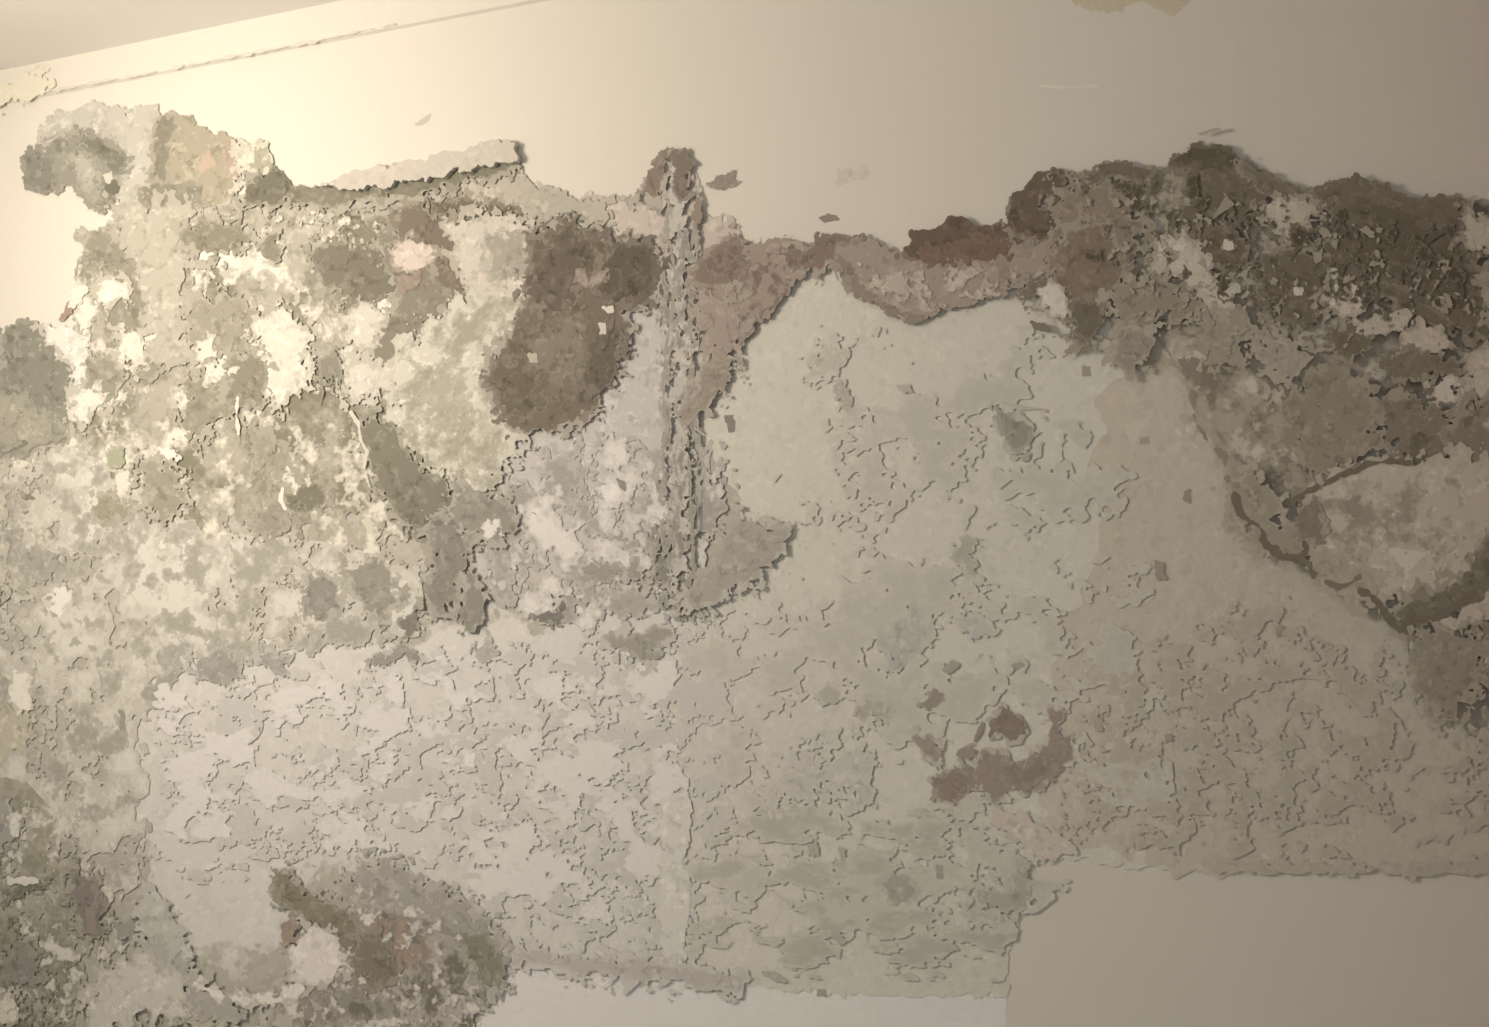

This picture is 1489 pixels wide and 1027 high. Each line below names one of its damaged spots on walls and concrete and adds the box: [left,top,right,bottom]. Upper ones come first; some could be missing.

peeling [1071,0,1191,16]
flaking render [0,105,858,1027]
damp [0,99,1489,750]
spalling [988,400,1047,461]
peeling [1036,276,1072,328]
peeling [1063,158,1489,655]
crack [1189,390,1481,635]
damp [0,794,788,1027]
damp [749,660,1078,928]
flaking render [1411,656,1489,779]